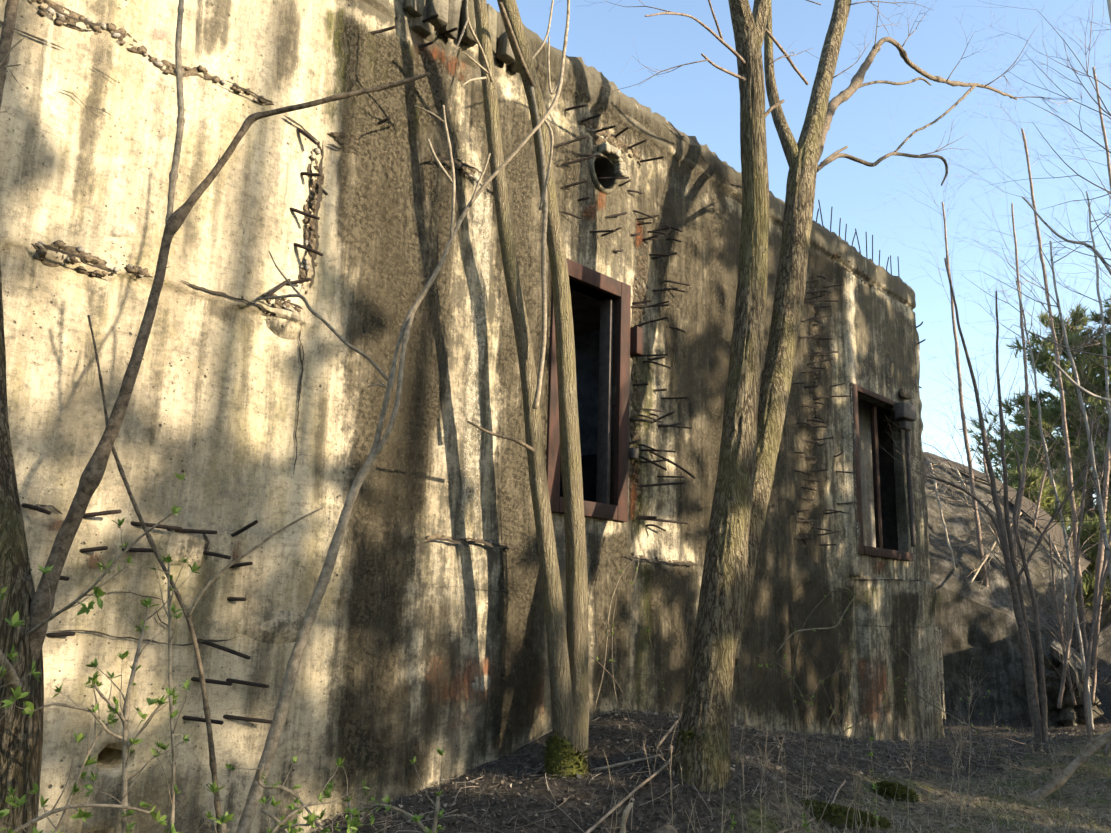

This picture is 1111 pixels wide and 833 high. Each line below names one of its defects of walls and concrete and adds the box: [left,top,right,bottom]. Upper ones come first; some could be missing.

spalling [27,0,275,105]
spalling [32,240,152,278]
crack [178,278,276,316]
spalling [262,127,368,312]
crack [293,330,304,474]
water stain [315,382,328,509]
water stain [326,8,552,791]
water stain [531,43,742,709]
water stain [732,216,945,726]